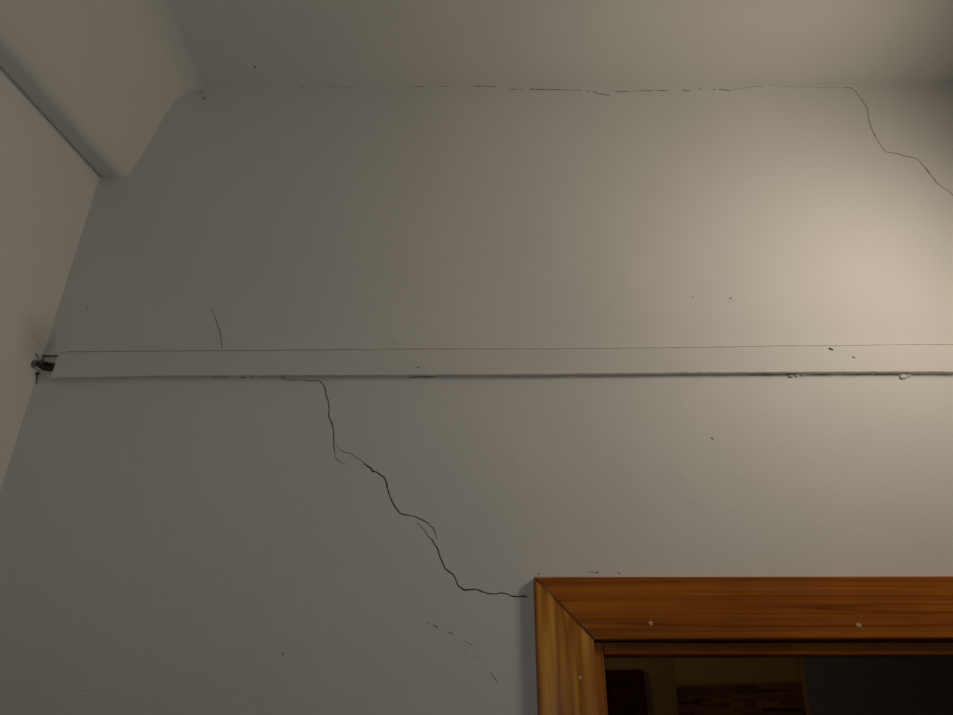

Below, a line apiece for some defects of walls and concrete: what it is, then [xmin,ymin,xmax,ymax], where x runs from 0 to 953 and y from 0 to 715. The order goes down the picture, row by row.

crack [790,86,953,195]
crack [165,308,279,351]
crack [642,342,953,350]
crack [281,377,527,597]